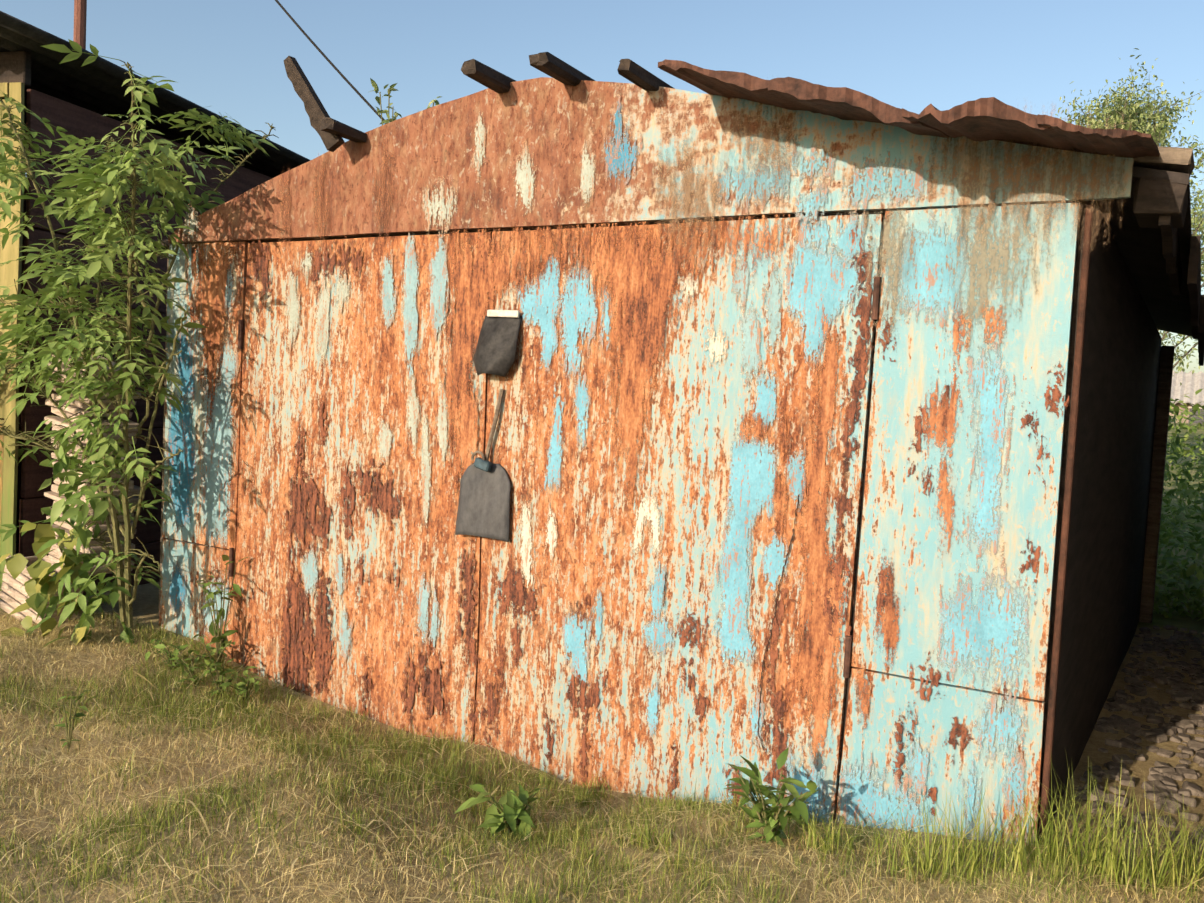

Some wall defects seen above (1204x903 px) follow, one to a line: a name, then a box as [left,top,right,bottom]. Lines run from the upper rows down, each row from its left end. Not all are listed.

peeling [166,261,238,555]
corrosion [280,396,404,695]
peeling [377,177,458,528]
corrosion [456,538,542,749]
peeling [515,253,615,590]
corrosion [439,213,799,510]
peeling [630,488,675,742]
corrosion [722,216,897,807]
peeling [704,137,967,674]
corrosion [873,557,905,672]
corrosion [907,303,1006,566]
peeling [933,333,1036,832]